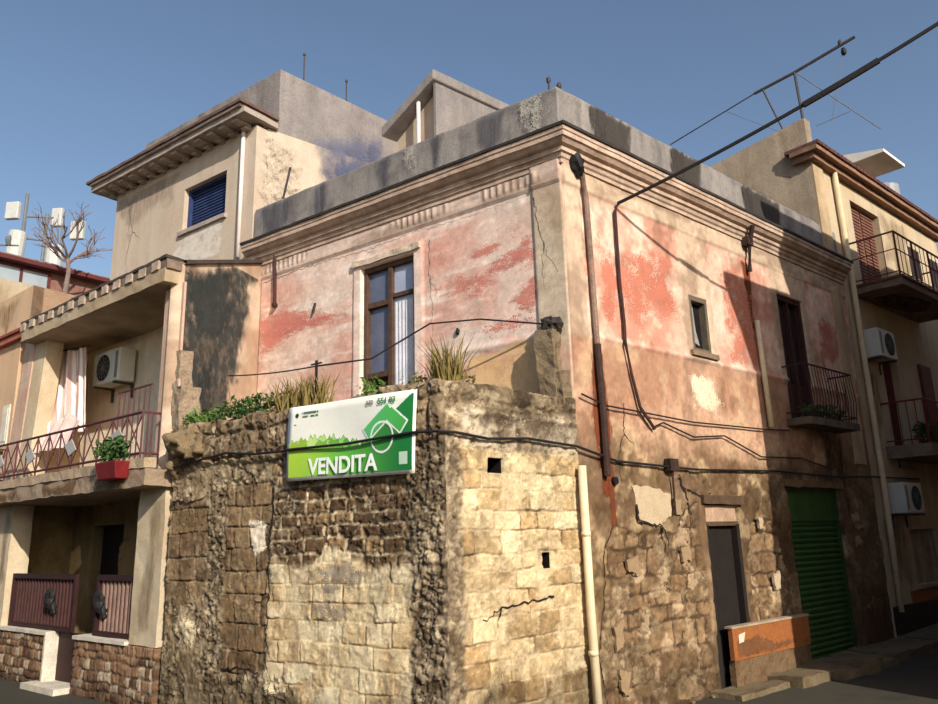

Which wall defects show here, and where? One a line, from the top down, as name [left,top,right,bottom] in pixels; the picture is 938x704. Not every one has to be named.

water stain [257,130,305,230]
water stain [590,105,631,151]
crack [266,196,558,348]
water stain [183,265,258,417]
water stain [258,302,352,370]
corrosion [592,356,617,529]
flaking render [118,540,136,575]
crack [221,480,275,680]
crack [483,595,555,629]
spalling [599,485,720,704]
spalling [747,508,796,621]
peeling [737,634,808,659]